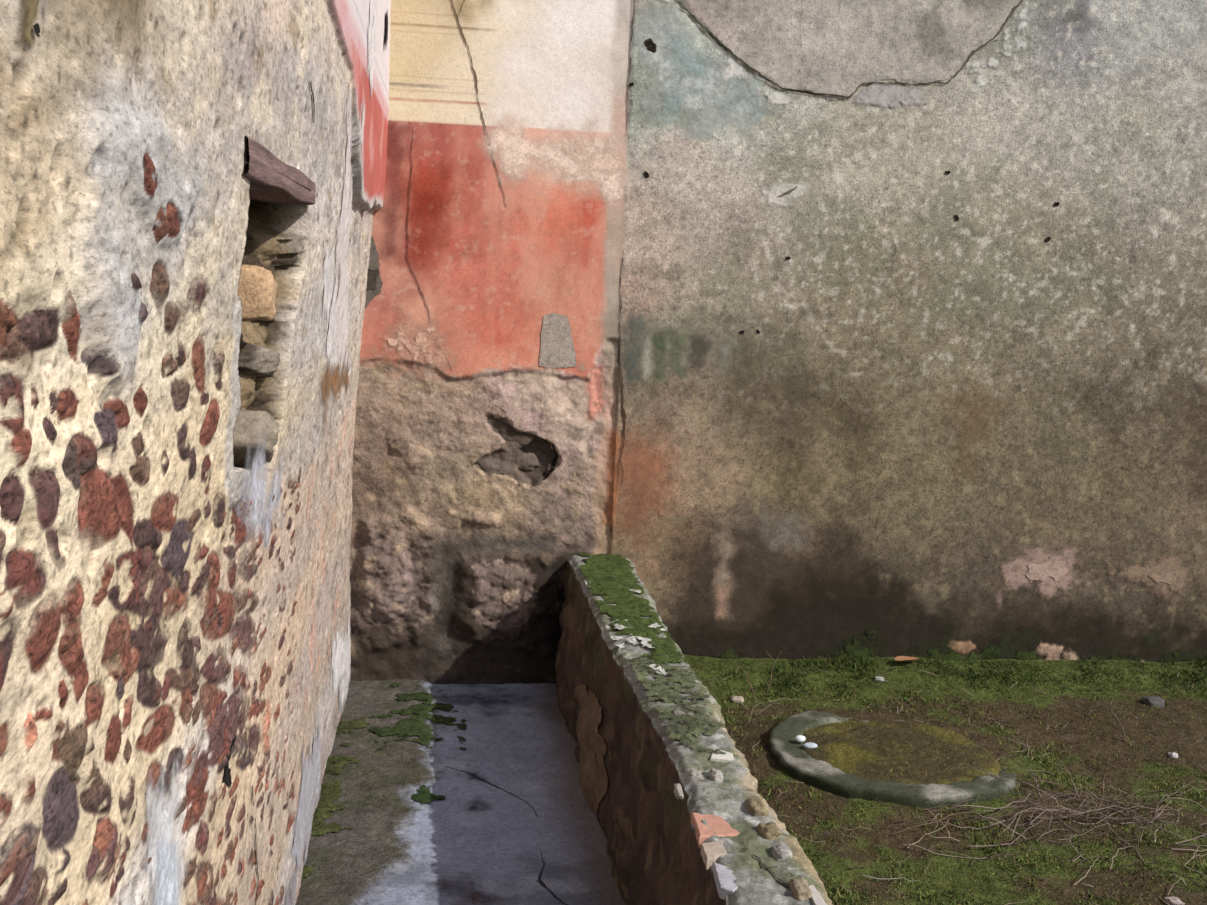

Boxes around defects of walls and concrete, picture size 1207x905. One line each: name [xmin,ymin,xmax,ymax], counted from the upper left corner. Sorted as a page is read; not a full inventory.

crack [451,0,507,207]
peeling [485,118,631,202]
crack [406,130,452,369]
flaking render [322,2,609,711]
water stain [668,521,1207,663]
peeling [997,543,1090,602]
peeling [1109,554,1188,603]
crack [446,766,538,816]
crack [536,853,568,905]